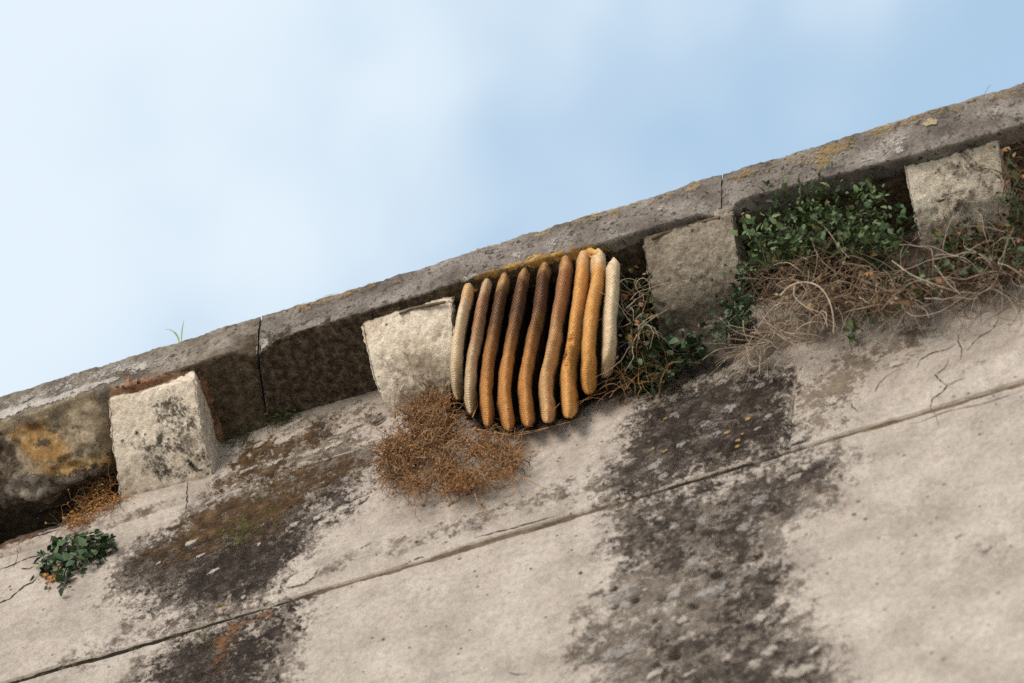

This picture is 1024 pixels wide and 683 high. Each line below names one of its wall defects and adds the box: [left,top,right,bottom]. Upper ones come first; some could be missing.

water stain [0,260,576,683]
water stain [379,173,1024,683]
crack [875,318,1021,426]
water stain [1000,141,1024,196]